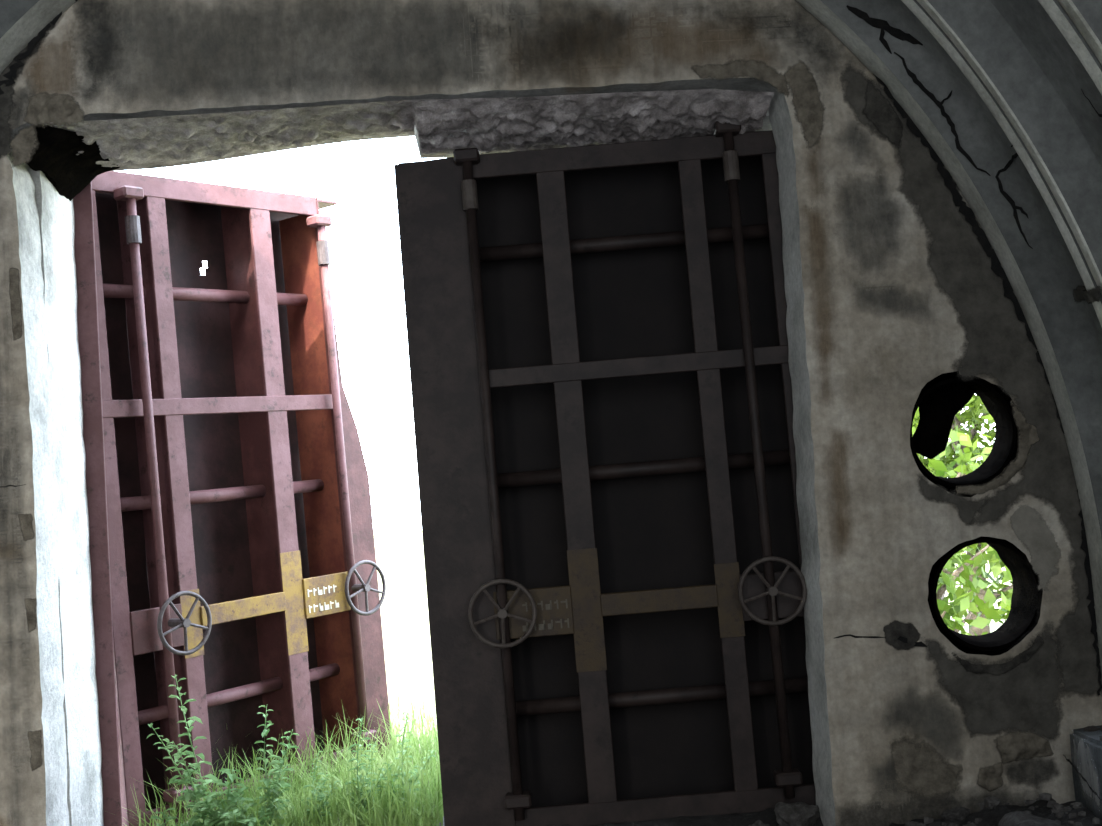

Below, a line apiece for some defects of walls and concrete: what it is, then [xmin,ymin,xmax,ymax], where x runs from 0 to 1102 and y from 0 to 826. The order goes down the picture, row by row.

spalling [0,23,825,201]
damp [843,178,897,264]
crack [846,5,1064,433]
peeling [9,268,22,340]
damp [859,287,921,312]
peeling [18,514,34,540]
peeling [25,598,37,632]
crack [835,634,927,647]
crack [1077,489,1102,695]
peeling [28,730,42,770]
damp [1073,739,1099,806]
damp [840,792,1027,826]